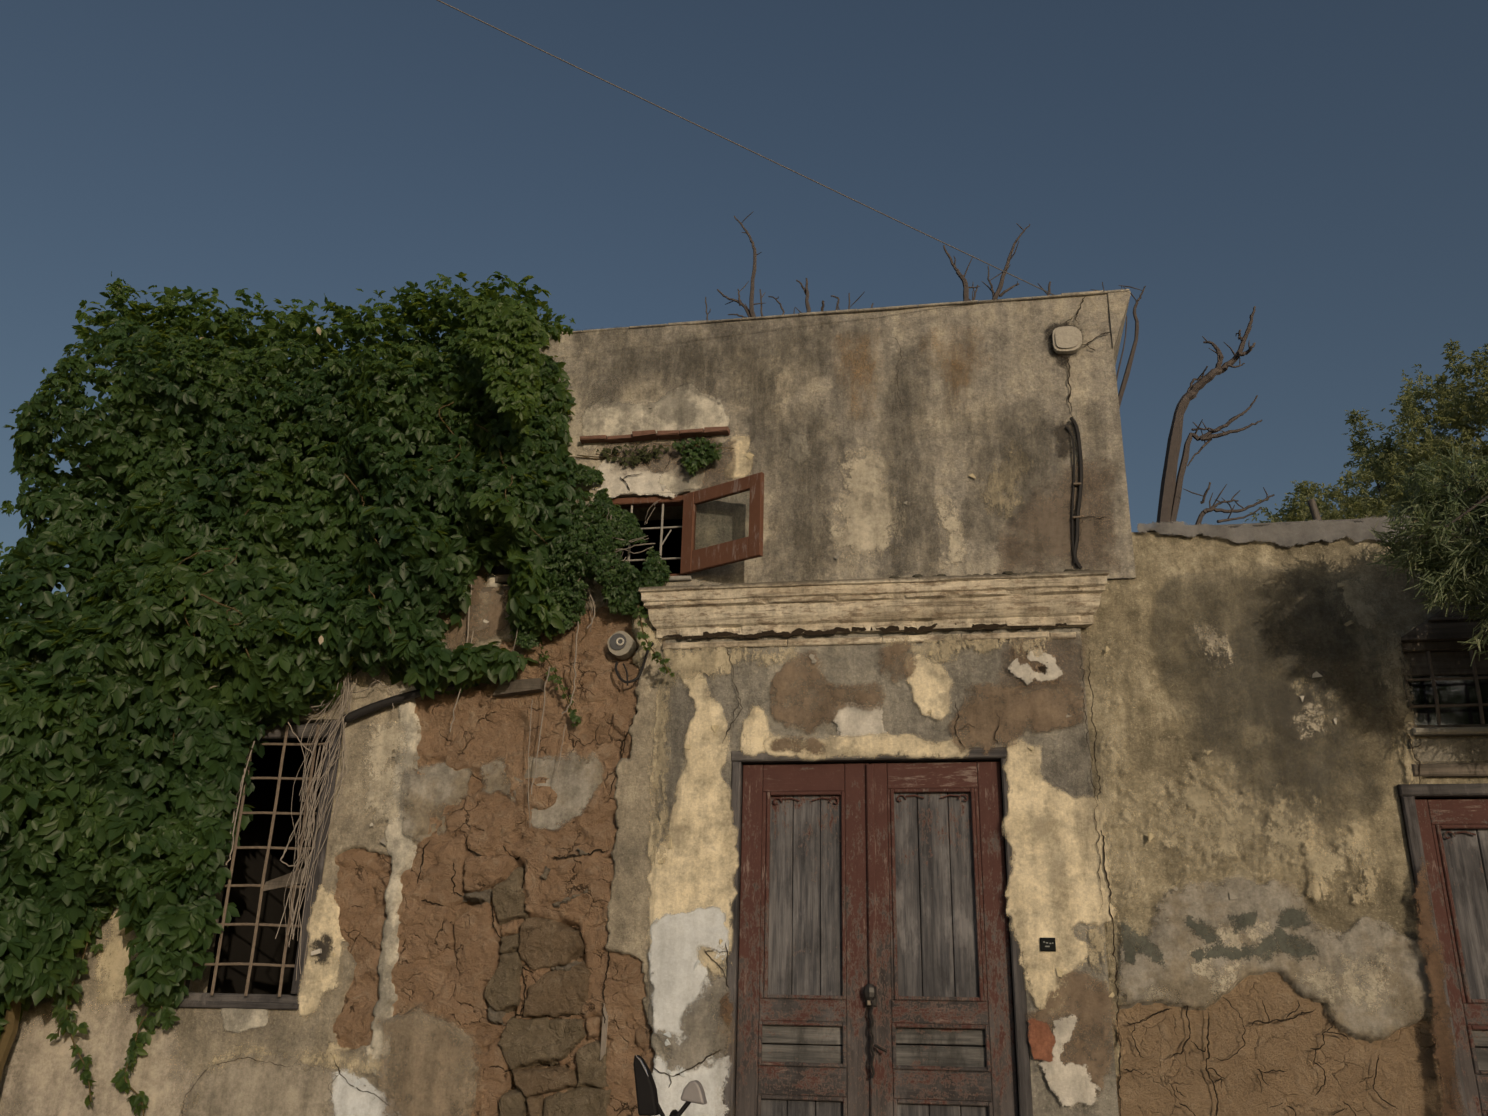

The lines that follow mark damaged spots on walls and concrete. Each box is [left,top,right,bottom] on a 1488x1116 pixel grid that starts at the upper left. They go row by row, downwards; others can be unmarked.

peeling [582,383,755,498]
damp [1045,321,1084,367]
crack [1052,297,1111,414]
damp [1156,571,1392,813]
flaking render [200,561,1446,1116]
crack [653,623,1398,1116]